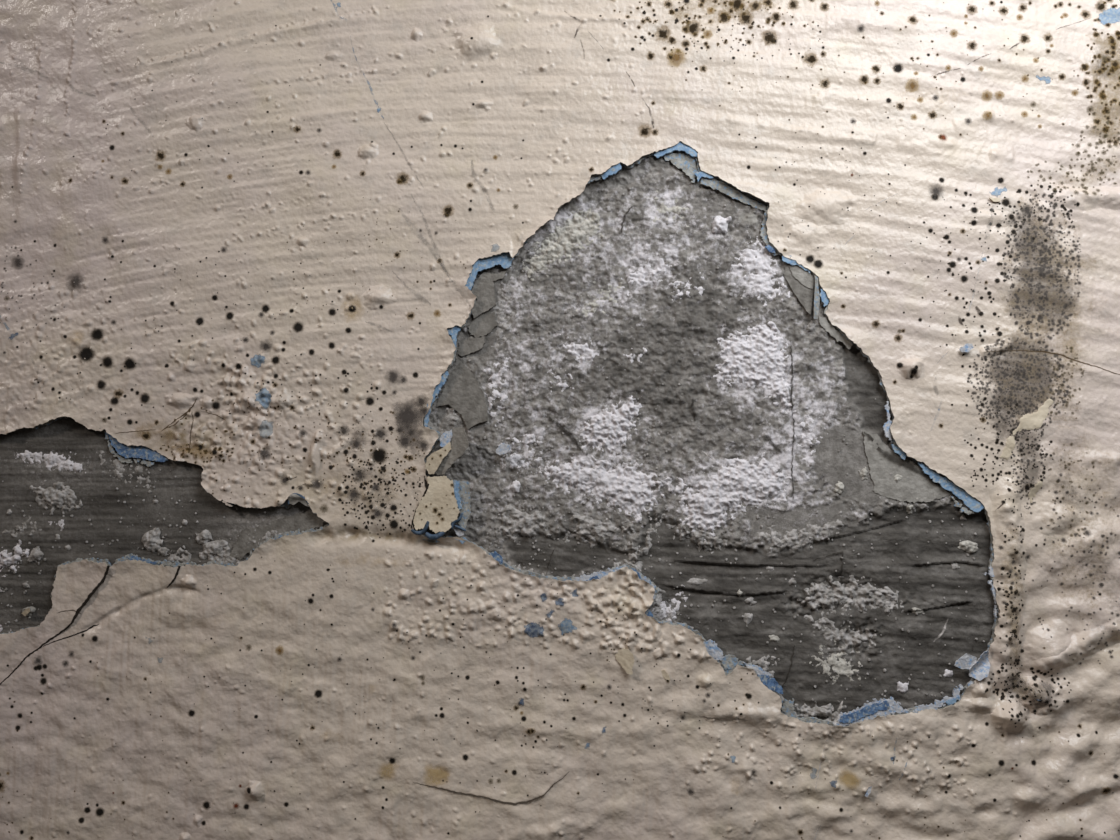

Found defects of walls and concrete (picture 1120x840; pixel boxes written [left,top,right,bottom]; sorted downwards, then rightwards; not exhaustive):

water stain [599,0,840,88]
water stain [861,40,965,129]
water stain [1,240,55,309]
water stain [778,206,834,268]
peeling [411,142,999,726]
peeling [0,416,329,634]
crack [0,566,110,685]